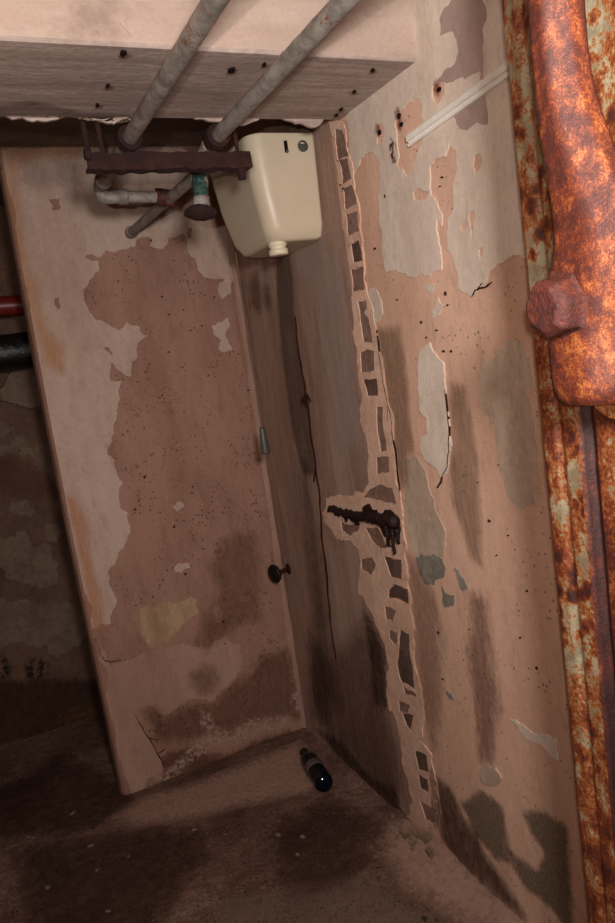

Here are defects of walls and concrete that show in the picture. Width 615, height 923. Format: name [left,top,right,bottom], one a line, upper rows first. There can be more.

spalling [4,116,132,125]
peeling [0,147,234,658]
peeling [282,0,527,828]
peeling [478,338,539,509]
crack [134,714,166,772]
damp [145,712,297,787]
damp [325,735,399,809]
damp [438,783,571,923]